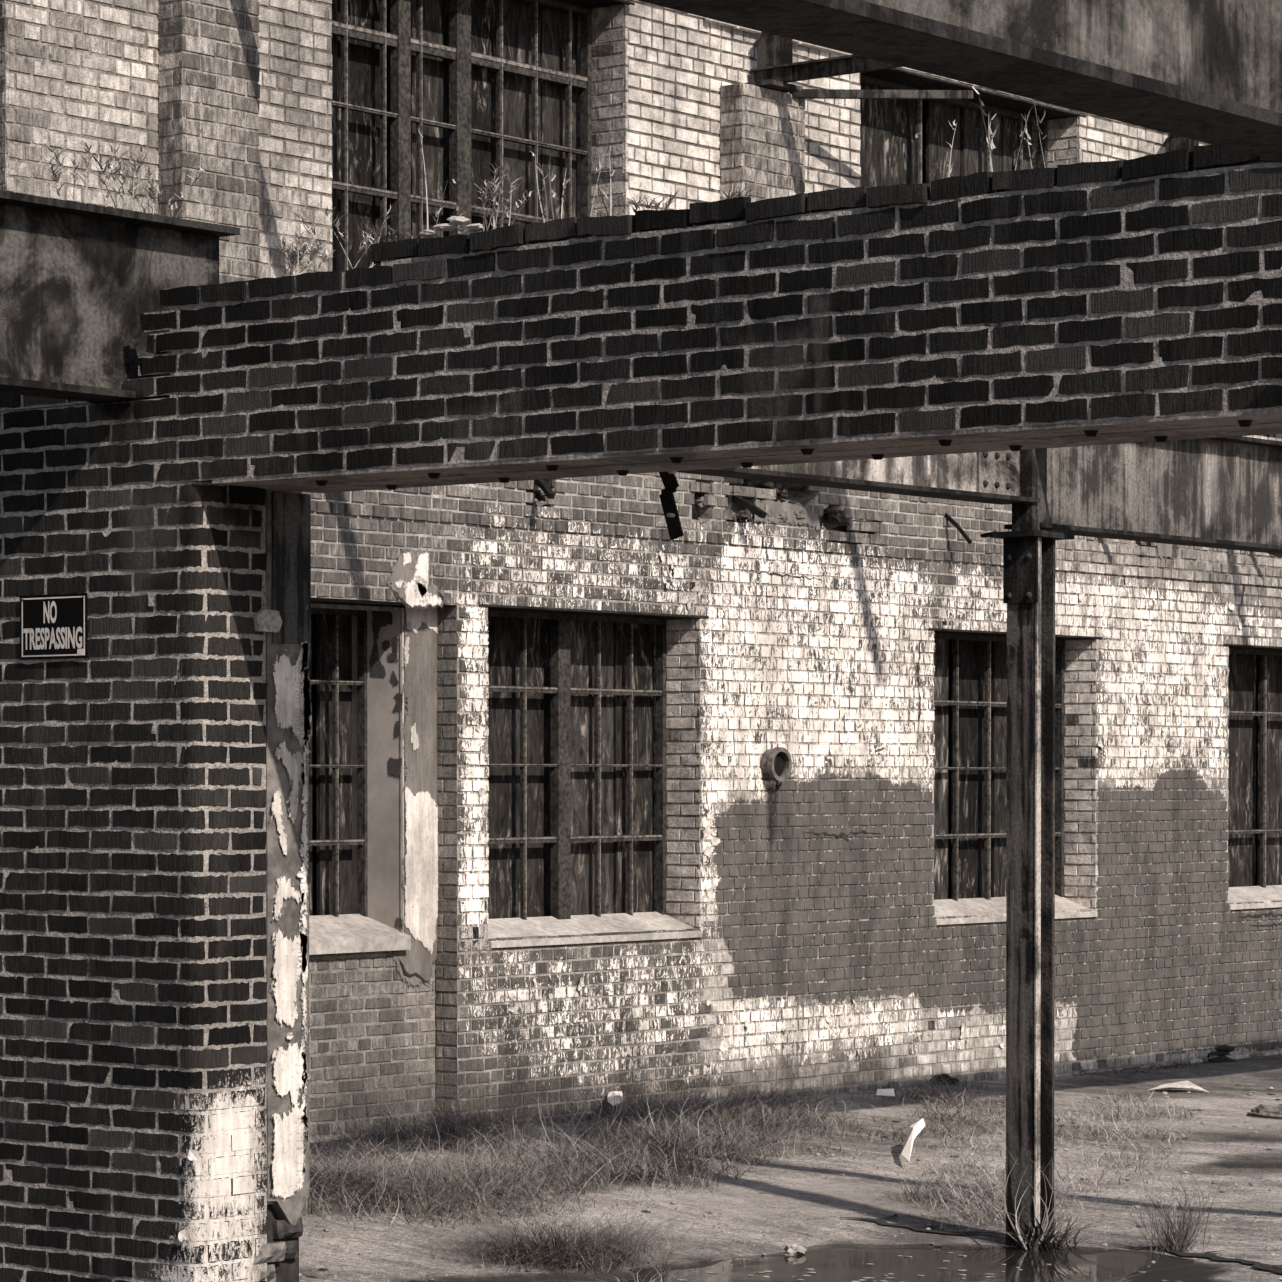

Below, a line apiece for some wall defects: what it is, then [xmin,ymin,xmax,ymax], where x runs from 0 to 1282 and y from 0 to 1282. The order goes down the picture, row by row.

corrosion [1205,448,1229,538]
peeling [369,479,1007,1106]
peeling [1055,541,1282,799]
peeling [147,642,312,1282]
peeling [1054,995,1082,1059]